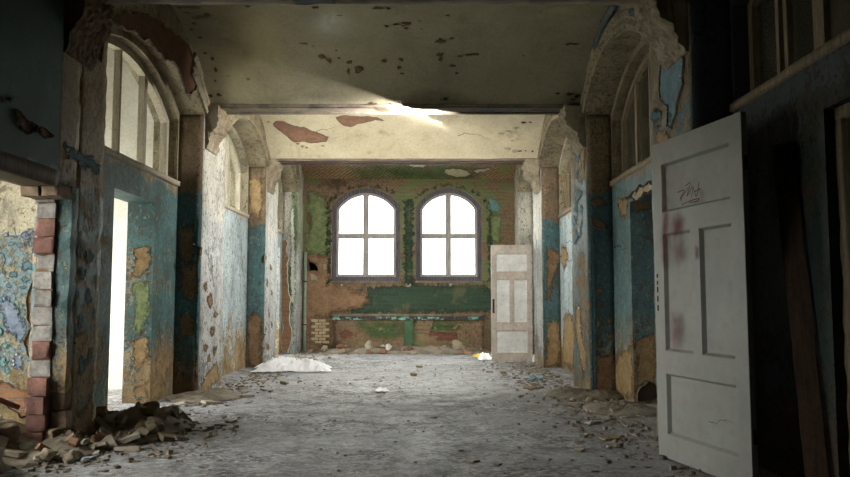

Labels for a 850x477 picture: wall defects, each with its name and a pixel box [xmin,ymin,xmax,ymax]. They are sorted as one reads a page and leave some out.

peeling [292,0,336,9]
flaking render [111,11,197,95]
peeling [299,43,363,74]
spalling [267,121,329,149]
spalling [336,102,427,127]
peeling [650,56,685,144]
spalling [129,245,151,291]
peeling [245,167,501,368]
spalling [522,150,657,402]
peeling [0,231,35,418]
spalling [129,322,150,372]